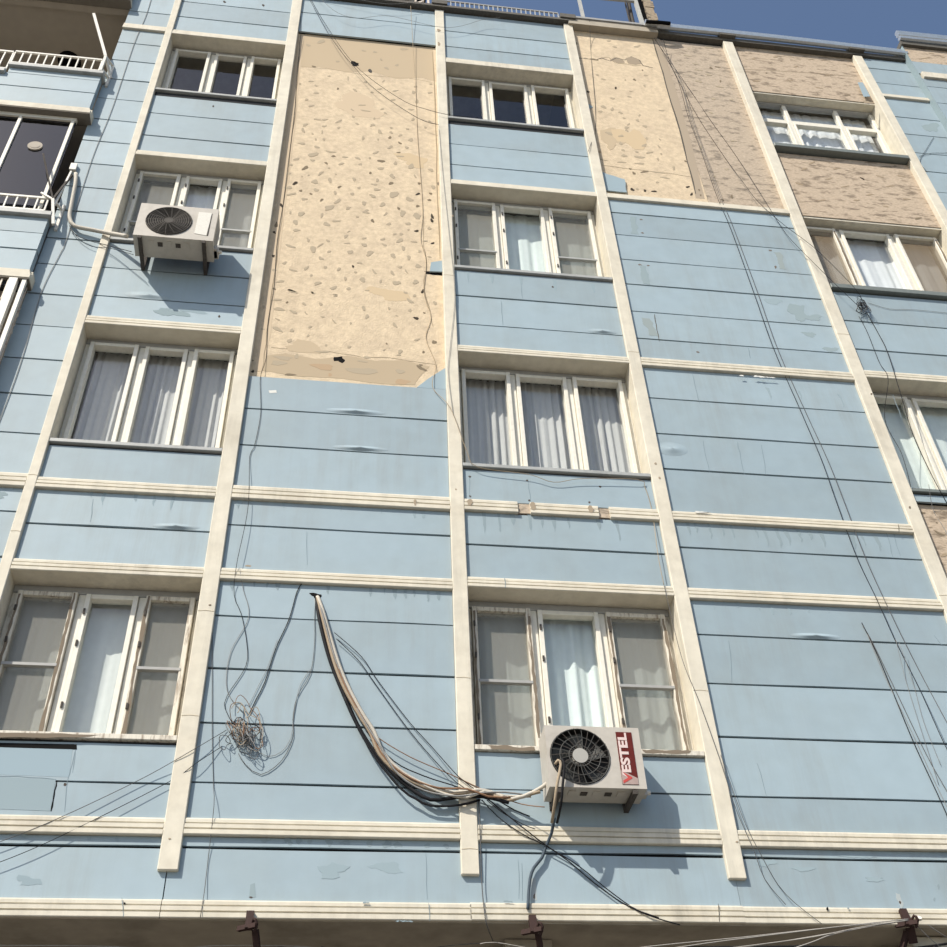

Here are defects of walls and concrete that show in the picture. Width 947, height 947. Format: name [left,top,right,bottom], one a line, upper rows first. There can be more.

spalling [252,37,446,389]
peeling [589,39,724,199]